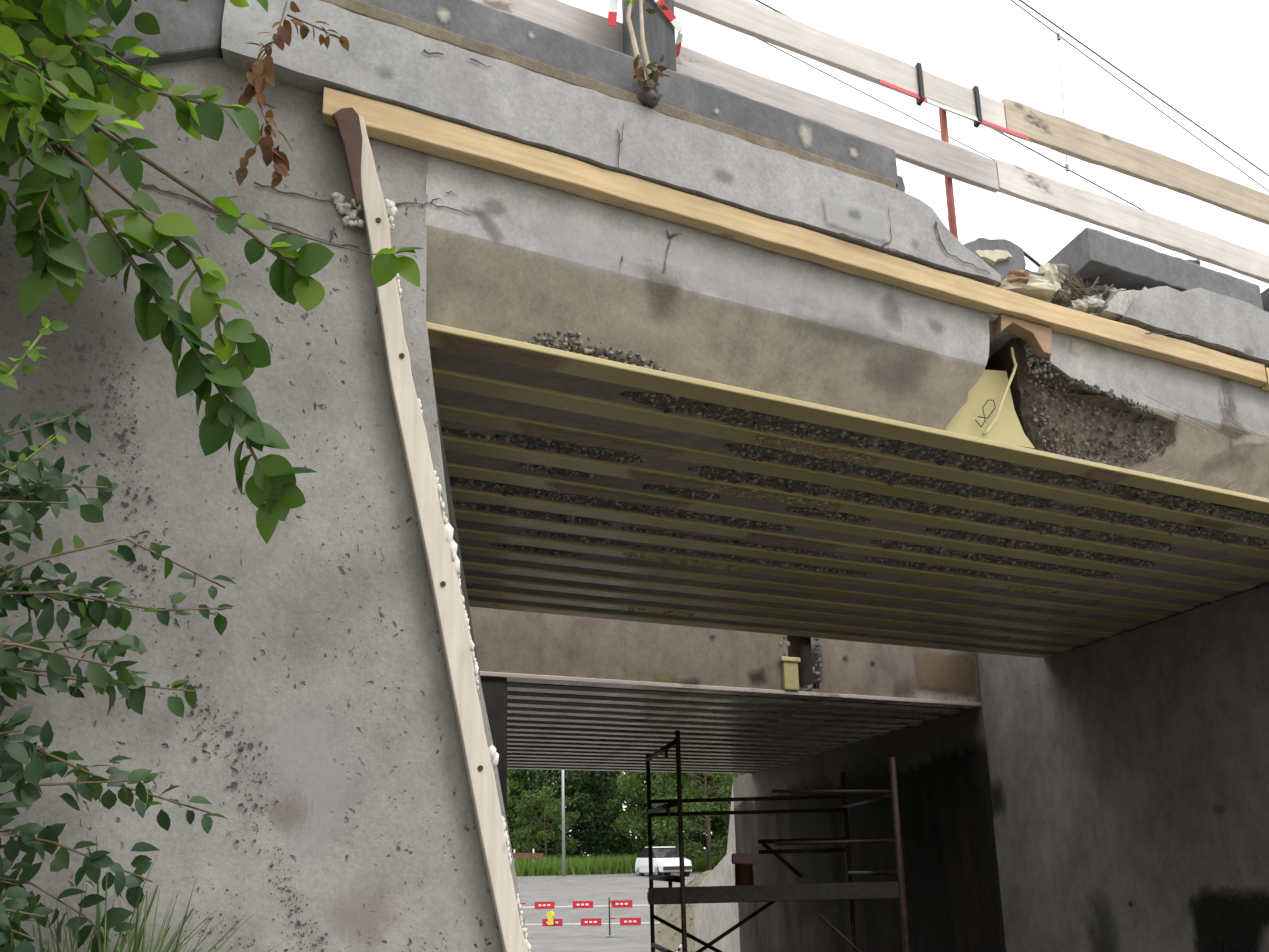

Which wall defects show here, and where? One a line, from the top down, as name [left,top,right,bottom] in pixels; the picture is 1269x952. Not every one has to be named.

crack [140,181,369,252]
crack [662,230,683,272]
crack [838,209,990,274]
spalling [985,337,1176,470]
leakage [1190,891,1269,952]